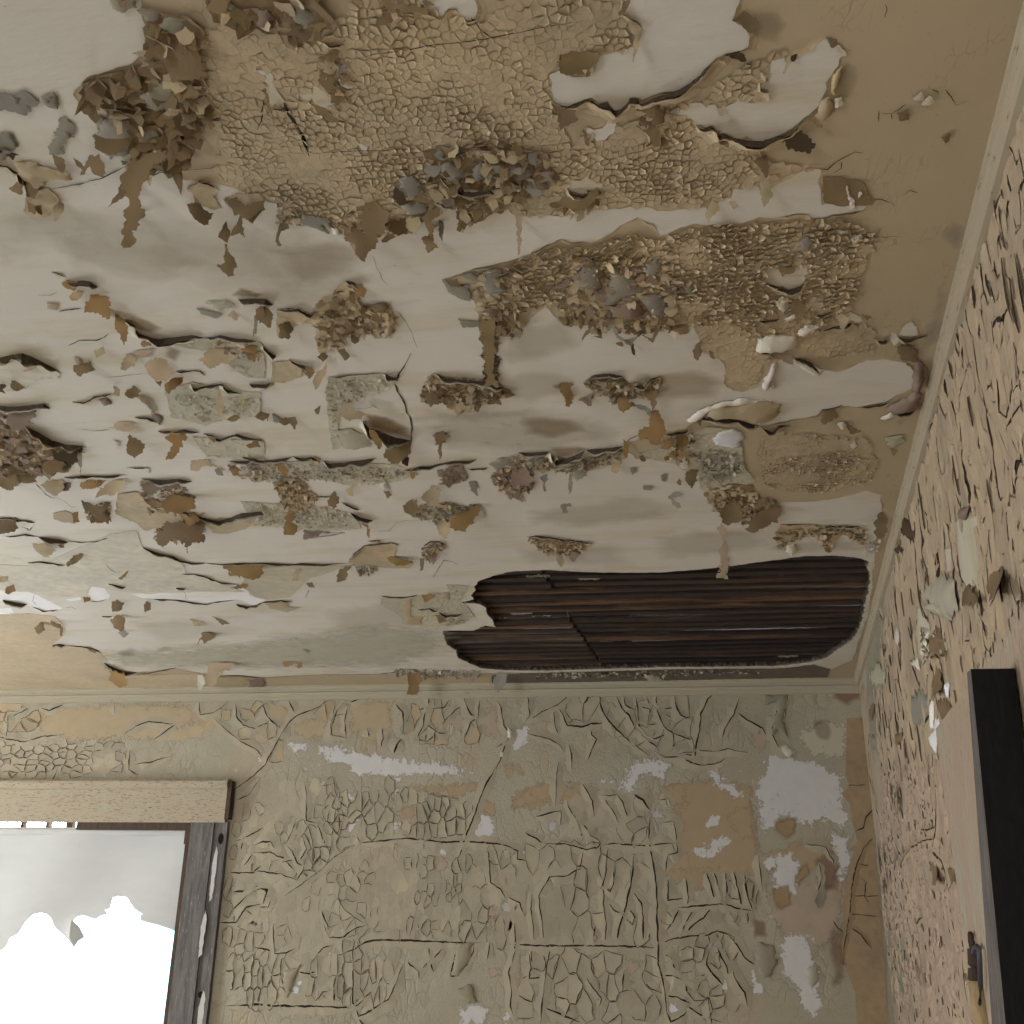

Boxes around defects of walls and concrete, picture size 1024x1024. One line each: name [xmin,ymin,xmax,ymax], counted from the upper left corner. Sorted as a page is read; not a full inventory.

crack [50,167,124,190]
crack [394,312,417,457]
flaking render [0,0,928,696]
crack [191,0,895,389]
peeling [897,92,935,121]
peeling [288,742,477,832]
crack [0,663,769,1024]
peeling [706,694,888,1024]
crack [833,105,1024,1024]
peeling [895,505,1007,754]